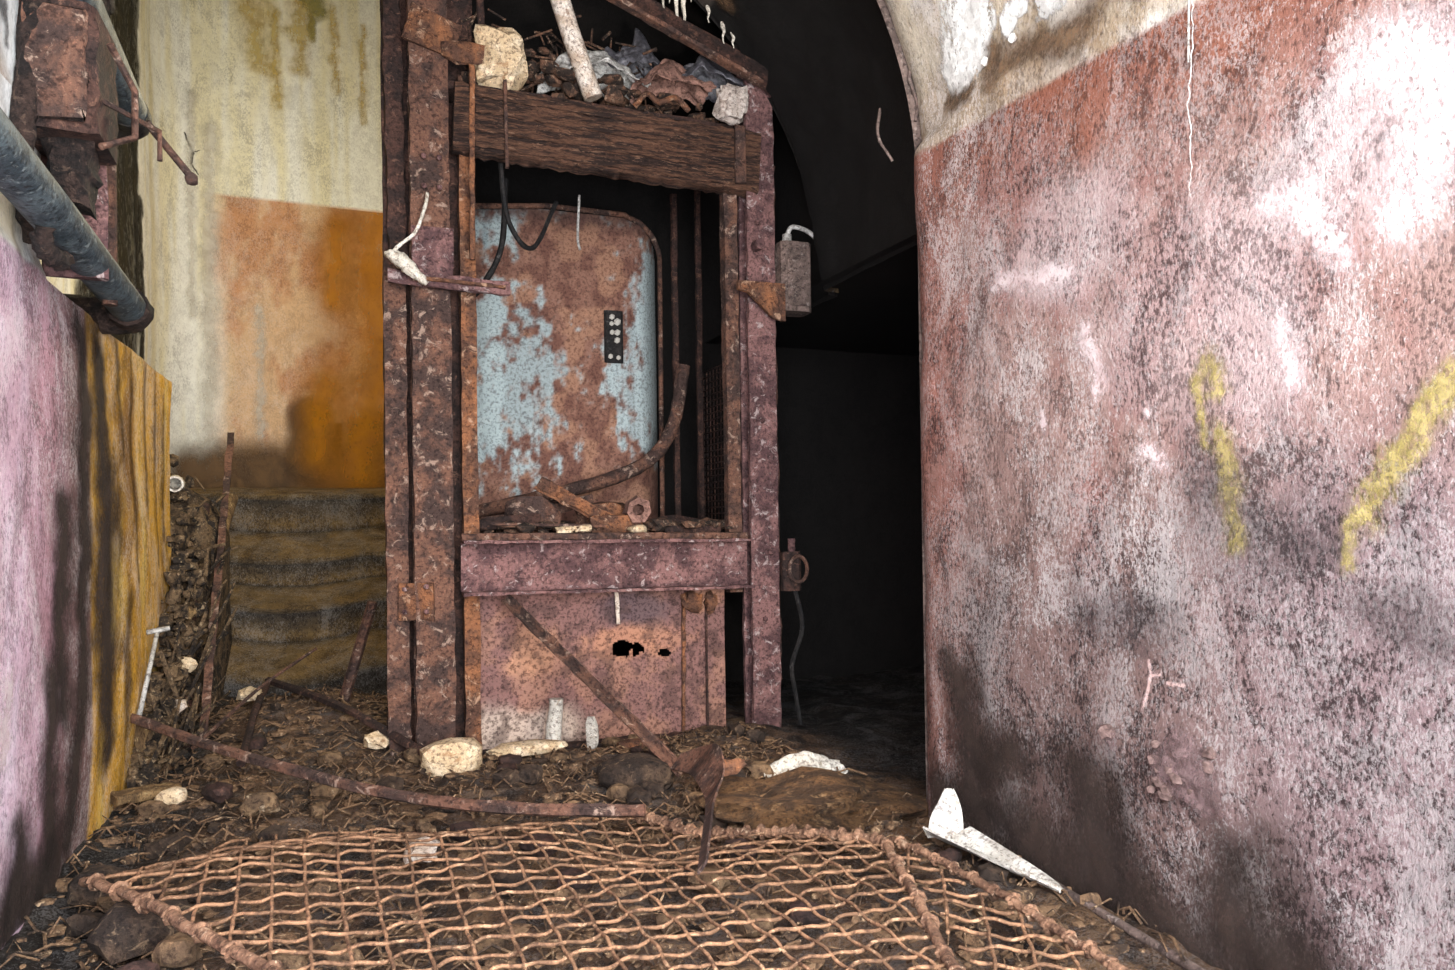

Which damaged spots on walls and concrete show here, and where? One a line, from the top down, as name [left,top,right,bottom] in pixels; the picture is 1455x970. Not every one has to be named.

damp [240,0,339,102]
peeling [940,0,1066,96]
damp [170,92,385,488]
damp [930,649,1330,970]